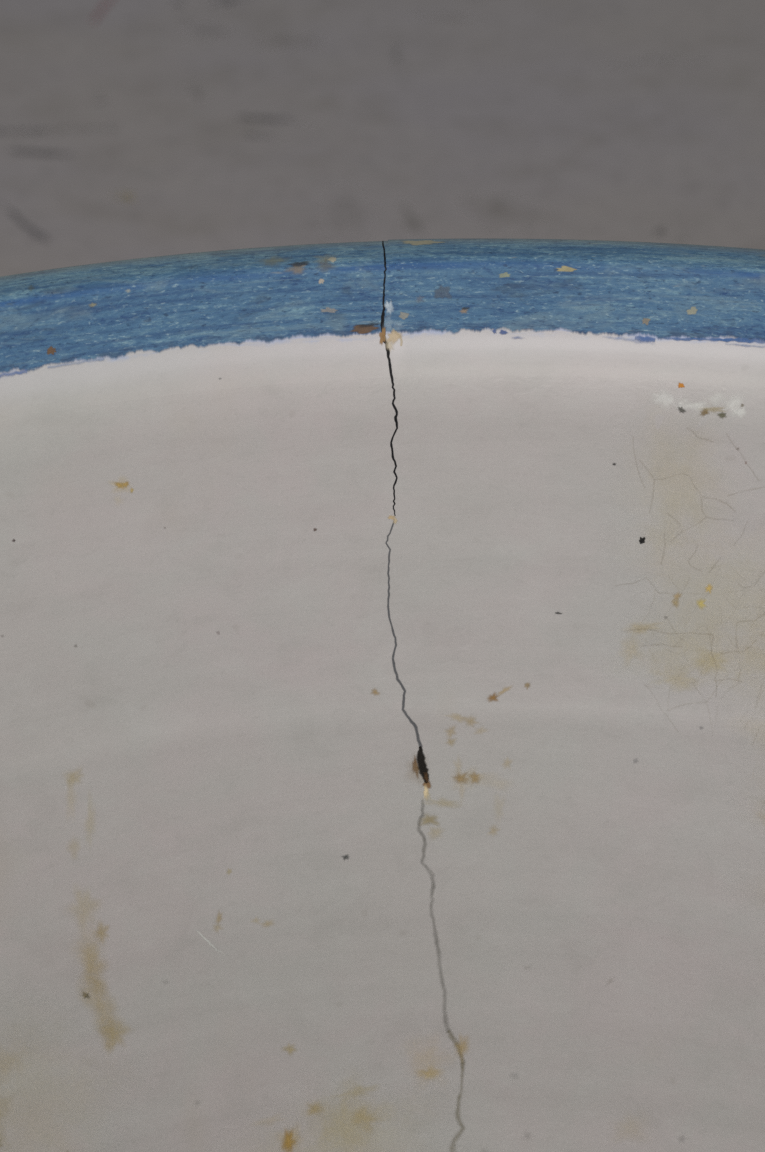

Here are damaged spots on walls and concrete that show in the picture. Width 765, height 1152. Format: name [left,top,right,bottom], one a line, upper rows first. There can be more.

crack [380,241,429,783]